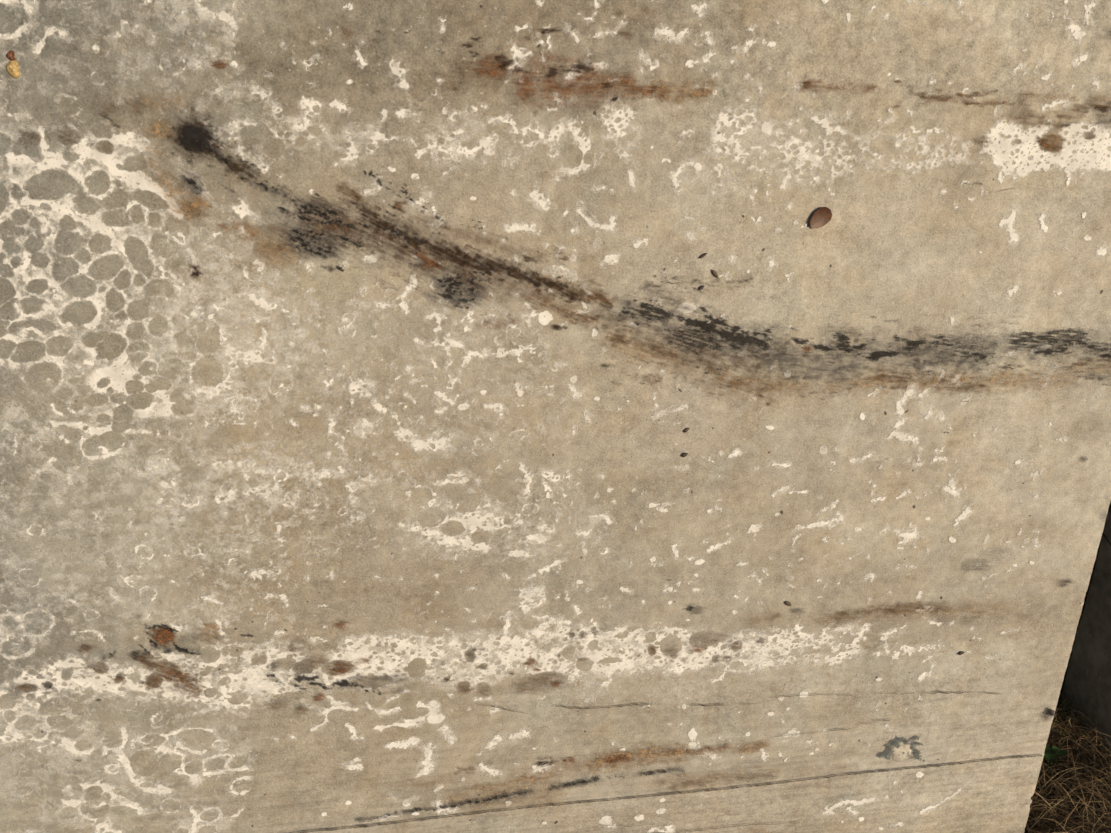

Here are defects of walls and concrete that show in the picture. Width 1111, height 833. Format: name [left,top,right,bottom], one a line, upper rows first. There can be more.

rust [463,37,712,101]
damp [166,109,1058,406]
damp [1011,328,1111,385]
rust [132,625,201,690]
damp [267,659,391,701]